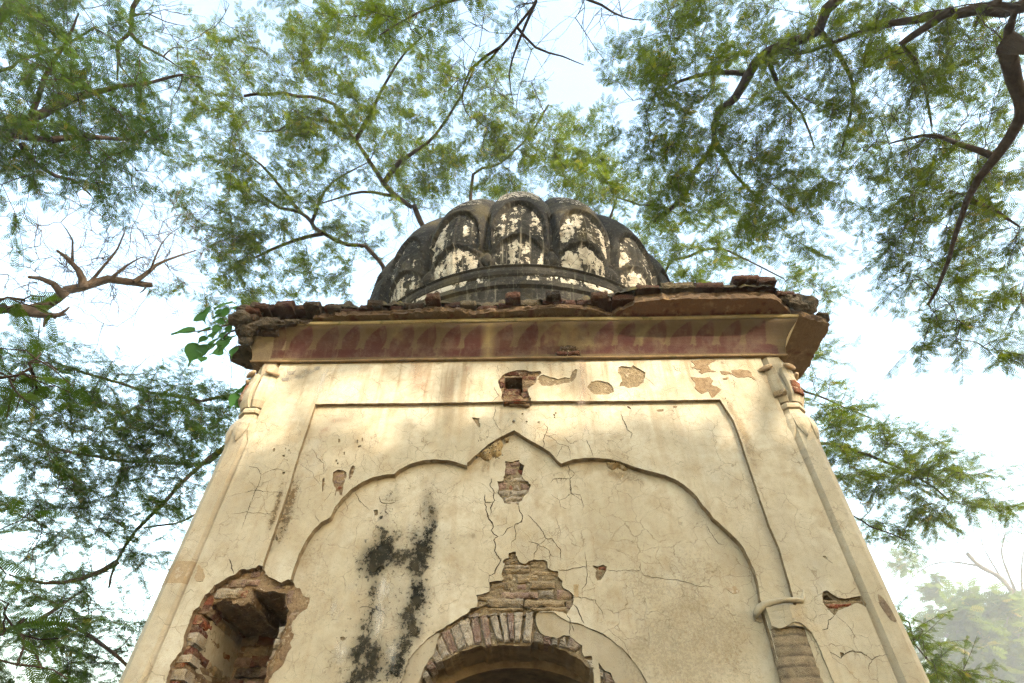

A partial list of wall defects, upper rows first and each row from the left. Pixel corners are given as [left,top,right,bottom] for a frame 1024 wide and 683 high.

peeling [389,198,488,303]
peeling [493,191,656,294]
spalling [779,293,830,322]
spalling [498,345,581,424]
crack [235,449,394,528]
spalling [497,460,531,505]
crack [484,424,712,653]
spalling [161,561,310,683]
water stain [346,489,438,683]
spalling [463,552,579,619]
crack [823,616,884,669]
spalling [822,591,897,622]